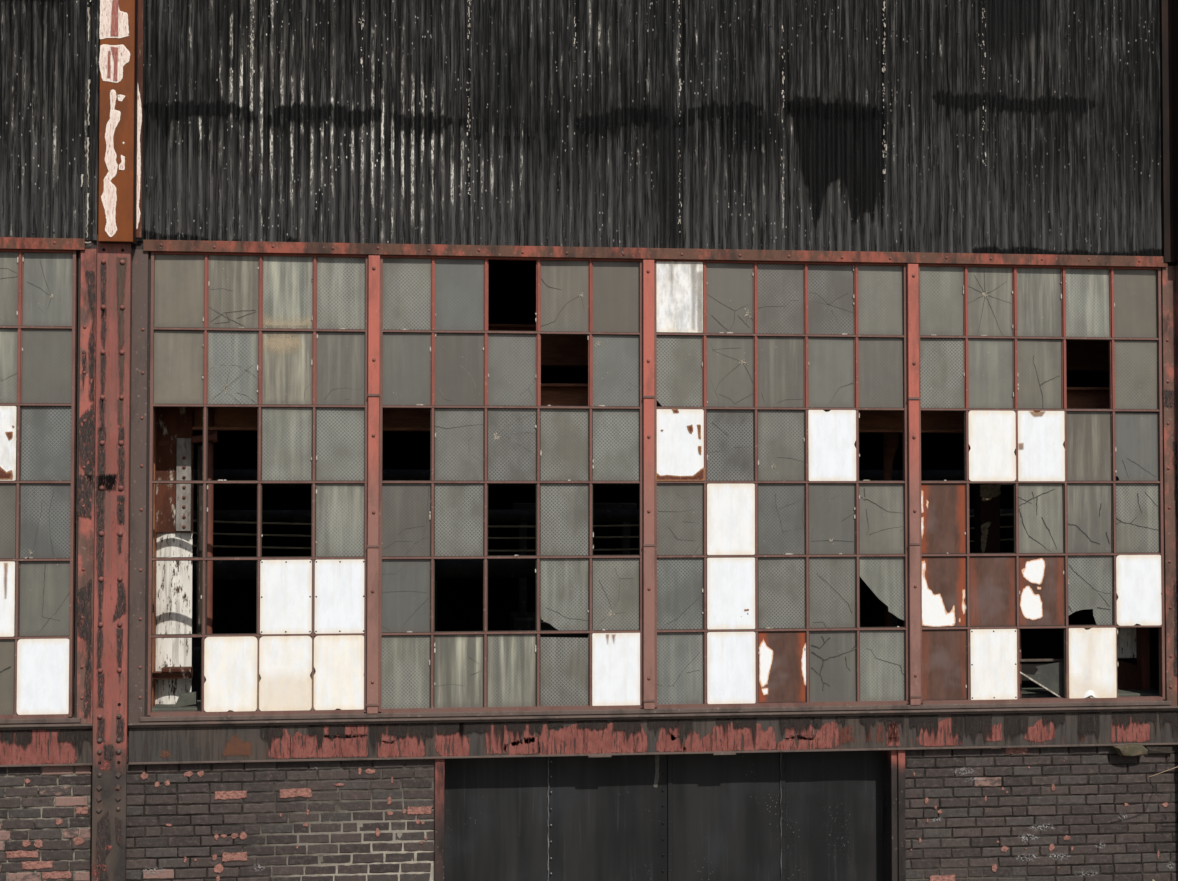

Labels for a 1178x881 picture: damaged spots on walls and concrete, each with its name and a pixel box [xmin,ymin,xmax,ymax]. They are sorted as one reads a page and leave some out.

peeling [81,0,142,243]
water stain [781,95,887,248]
corrosion [0,467,13,480]
peeling [917,717,962,747]
peeling [986,719,1055,769]
peeling [1111,717,1150,743]